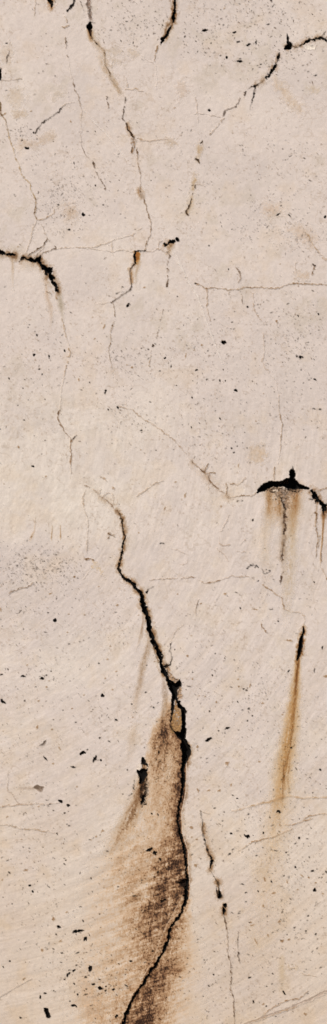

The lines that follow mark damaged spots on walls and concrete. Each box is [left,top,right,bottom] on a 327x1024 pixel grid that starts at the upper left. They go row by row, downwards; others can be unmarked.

crack [0,0,179,470]
crack [184,33,327,215]
crack [195,232,327,479]
crack [307,485,327,580]
corrosion [51,693,232,1024]
crack [81,404,305,1024]
corrosion [250,657,302,945]